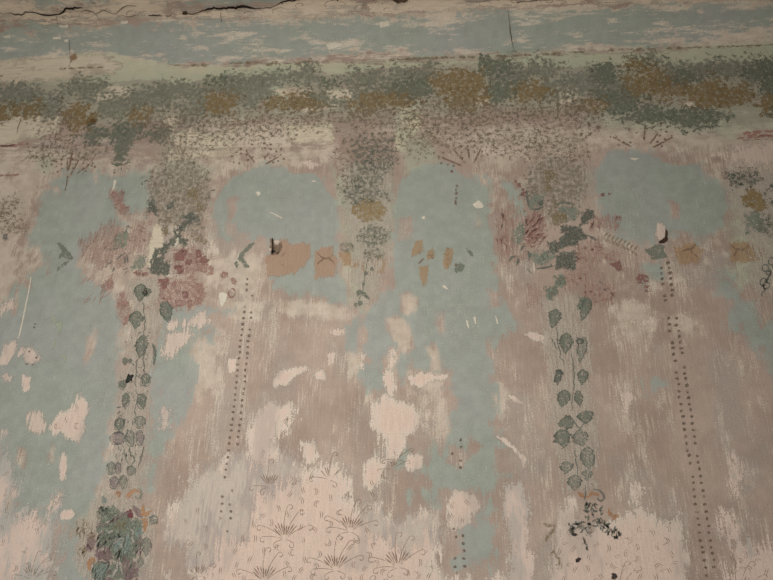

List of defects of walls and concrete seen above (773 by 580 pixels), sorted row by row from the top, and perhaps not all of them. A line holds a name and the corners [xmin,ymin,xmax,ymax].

crack [3,0,296,26]
peeling [0,0,586,42]
peeling [0,51,123,89]
flaking render [269,238,282,255]
flaking render [655,223,668,243]
peeling [160,309,217,360]
peeling [0,339,42,396]
peeling [26,392,90,445]
peeling [153,346,699,580]
peeling [0,420,75,580]
peeling [705,448,773,580]